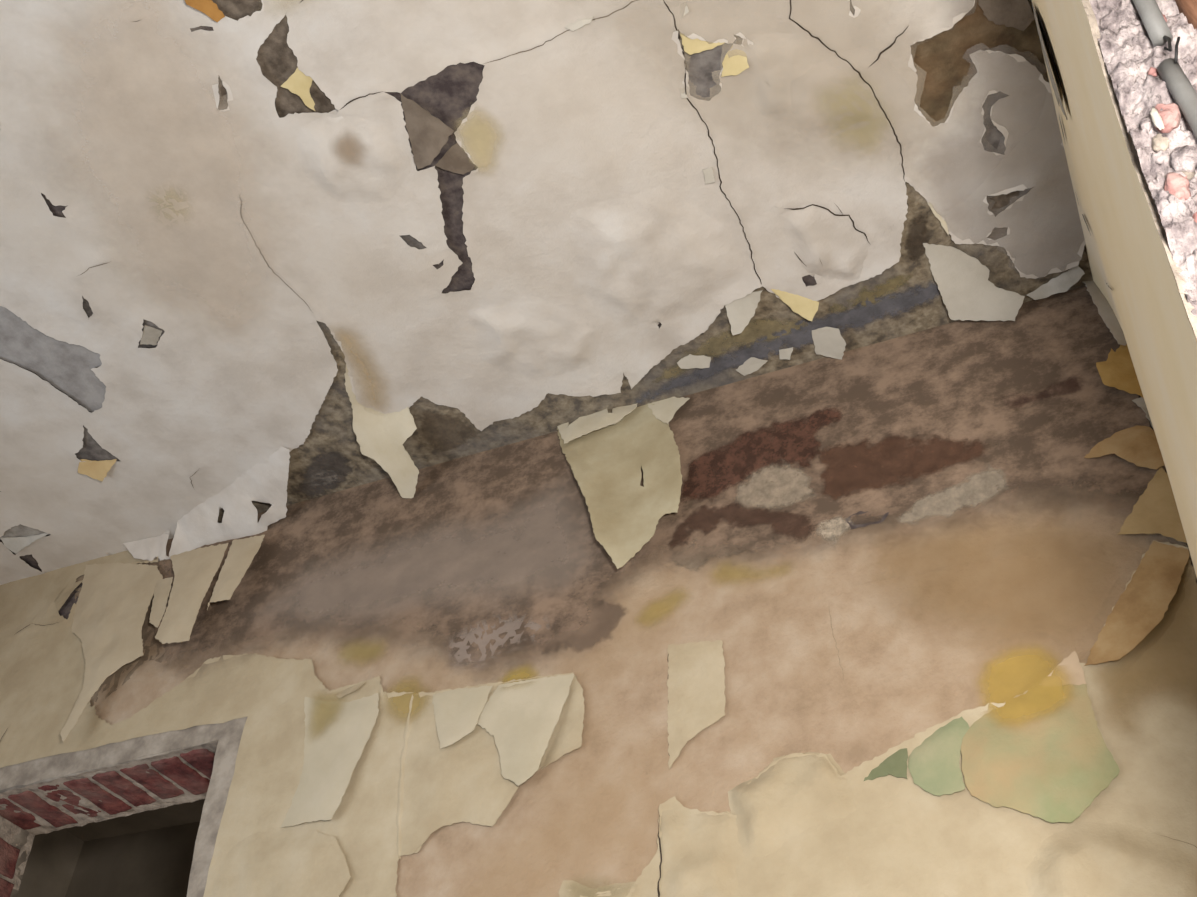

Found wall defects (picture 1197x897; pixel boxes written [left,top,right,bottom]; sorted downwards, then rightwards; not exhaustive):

peeling [256,15,335,118]
peeling [385,62,485,293]
crack [481,0,762,284]
crack [787,203,871,245]
crack [789,0,908,181]
peeling [911,0,1067,127]
leakage [164,286,1165,665]
leakage [153,538,175,626]
peeling [55,182,1190,897]
leakage [391,685,423,716]
leakage [985,653,1065,720]
crack [655,815,663,897]